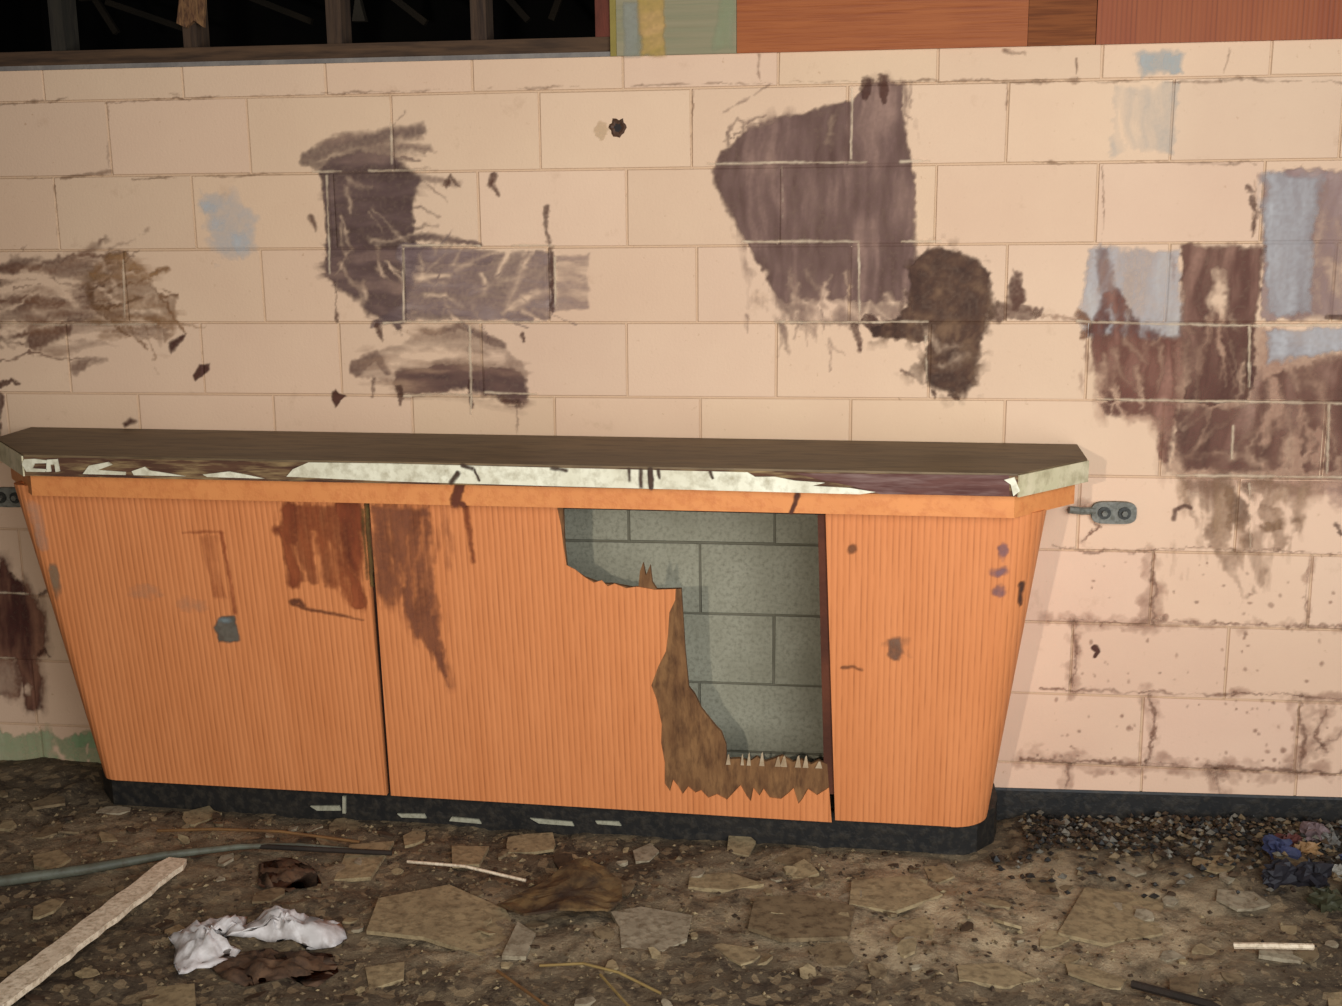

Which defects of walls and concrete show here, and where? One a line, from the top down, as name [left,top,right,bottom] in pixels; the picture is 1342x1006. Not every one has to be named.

peeling [383,244,453,324]
peeling [169,335,185,352]
peeling [1192,324,1341,372]